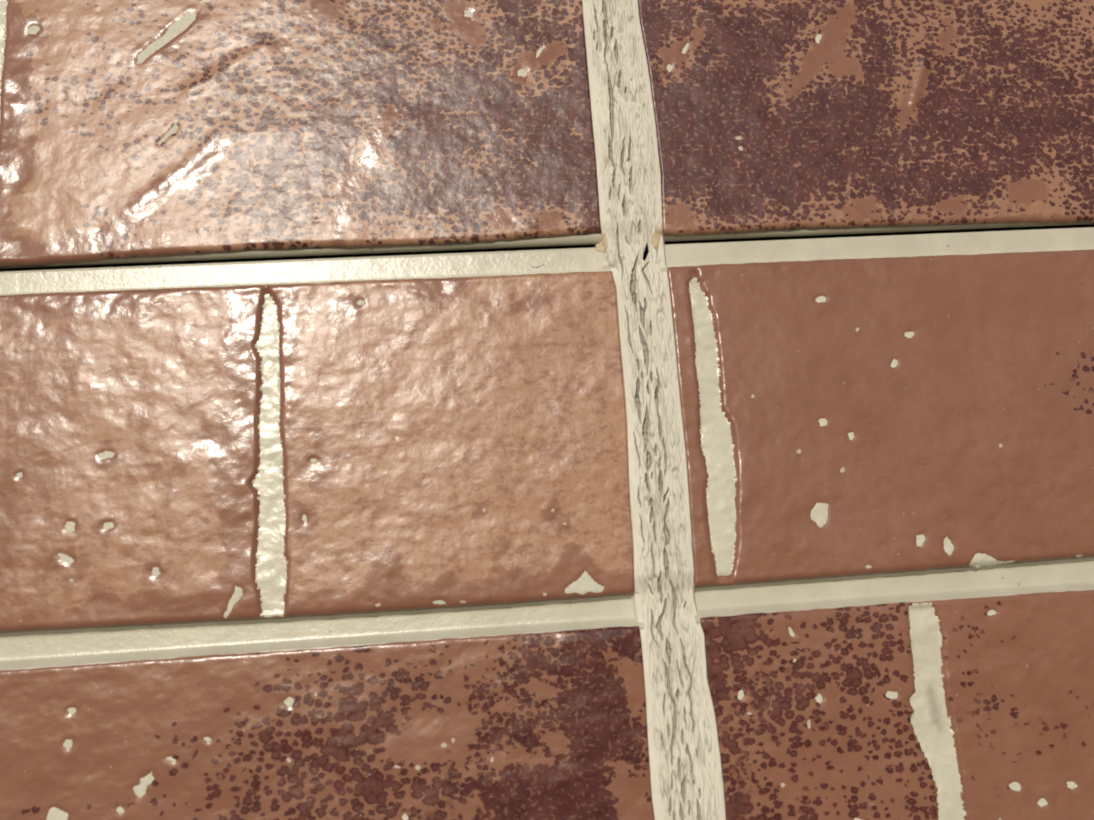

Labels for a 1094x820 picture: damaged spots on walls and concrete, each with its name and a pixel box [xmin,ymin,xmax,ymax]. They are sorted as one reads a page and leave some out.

peeling [136,13,196,64]
crack [594,0,701,820]